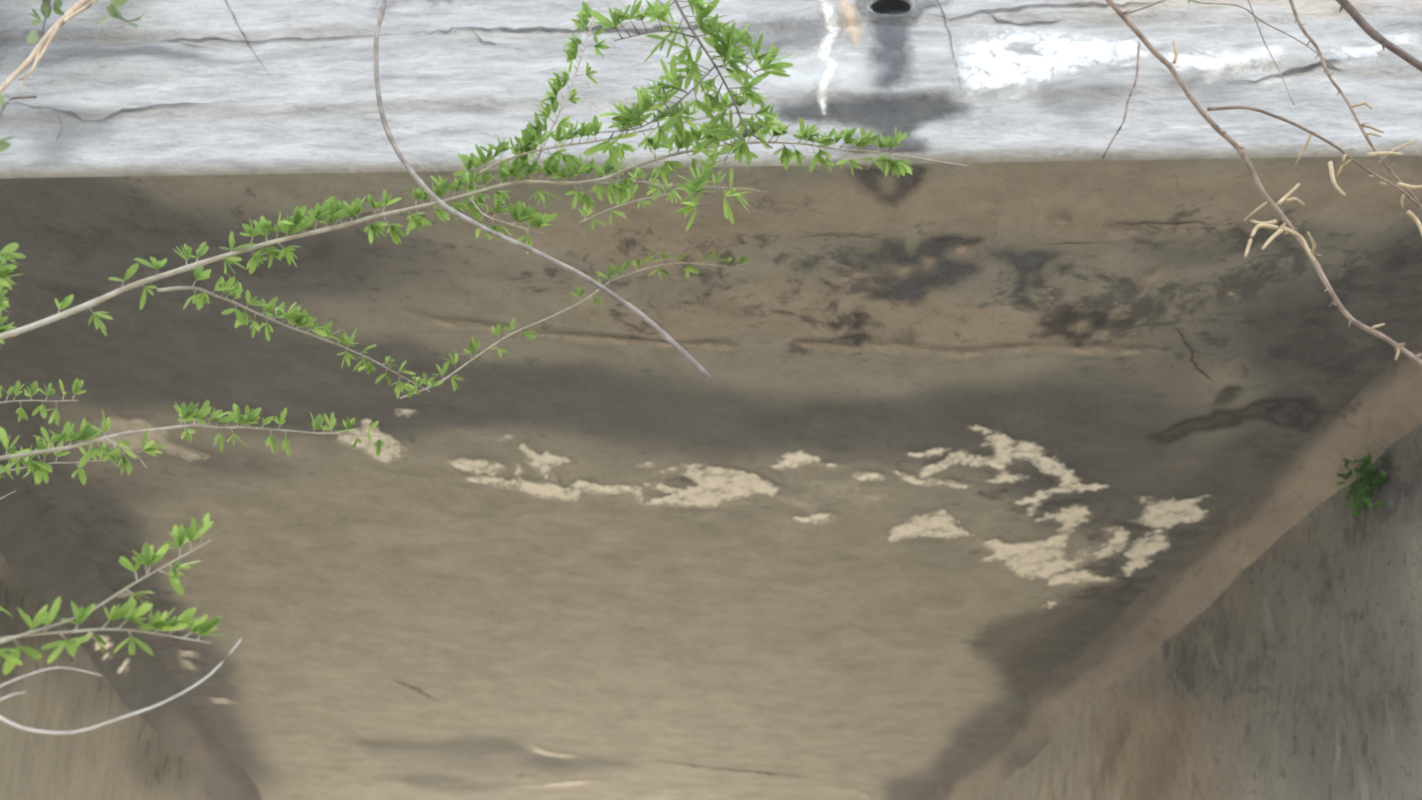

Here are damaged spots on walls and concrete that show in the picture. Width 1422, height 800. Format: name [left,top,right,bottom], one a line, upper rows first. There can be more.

crack [59,0,705,64]
damp [768,17,1150,152]
damp [1166,47,1283,82]
crack [8,100,234,141]
damp [853,167,927,203]
damp [850,239,978,302]
damp [1001,252,1070,300]
damp [833,313,869,346]
damp [1042,305,1130,348]
peeling [338,419,402,462]
peeling [447,434,839,507]
peeling [855,425,1209,608]